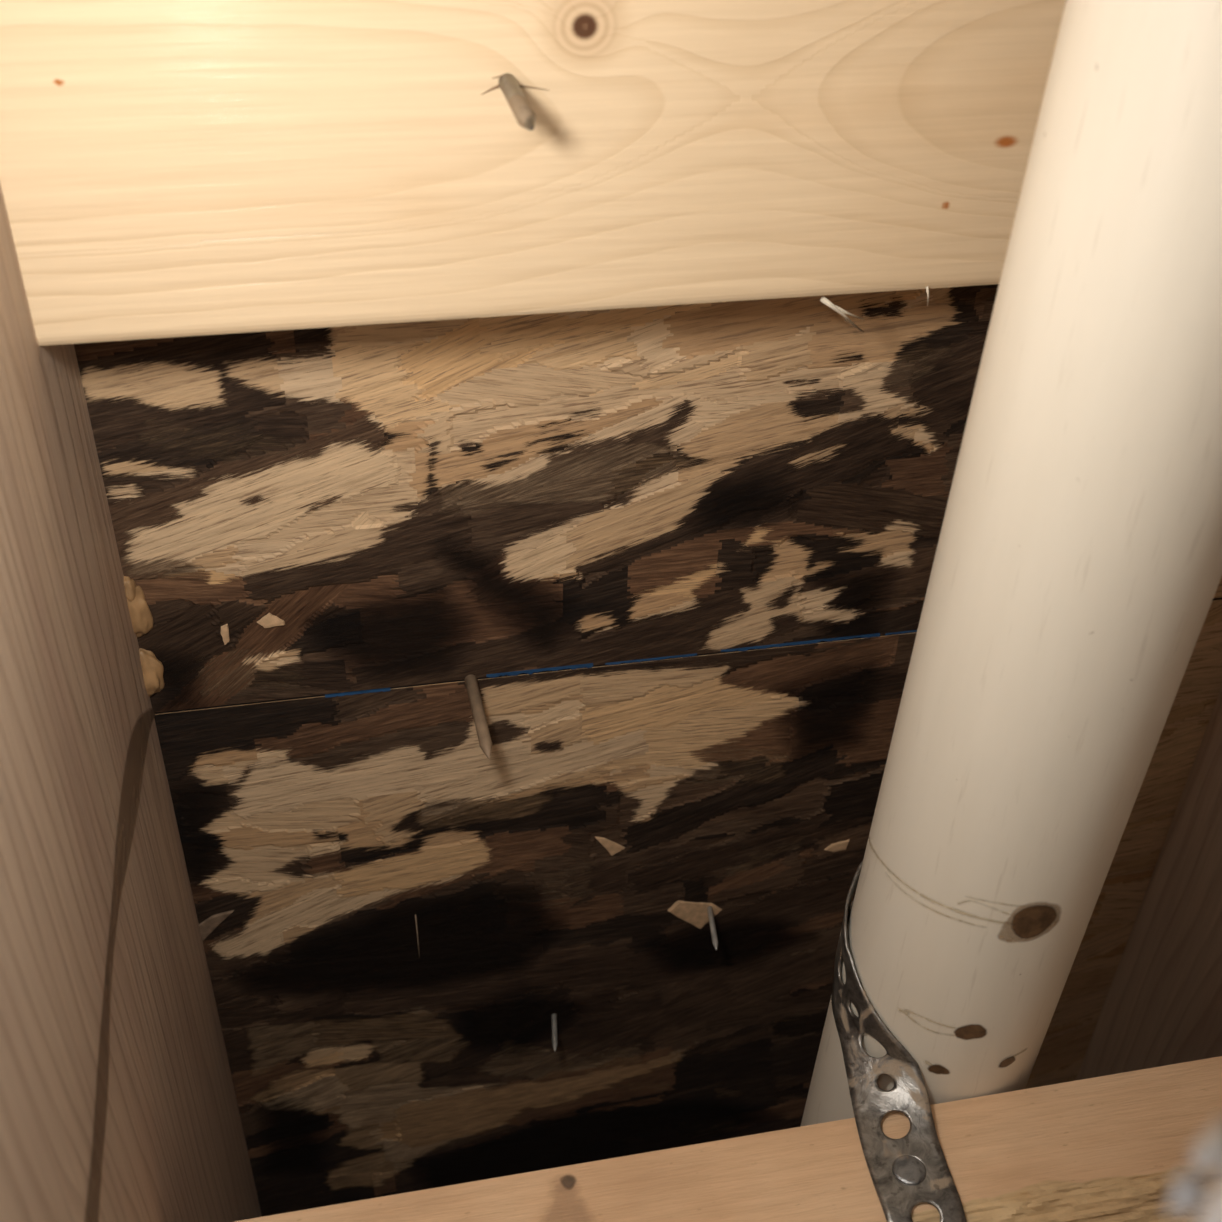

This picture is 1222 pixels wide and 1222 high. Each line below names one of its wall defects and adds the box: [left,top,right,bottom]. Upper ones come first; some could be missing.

water stain [74,284,999,1222]
water stain [922,895,1059,942]
water stain [999,1049,1026,1067]